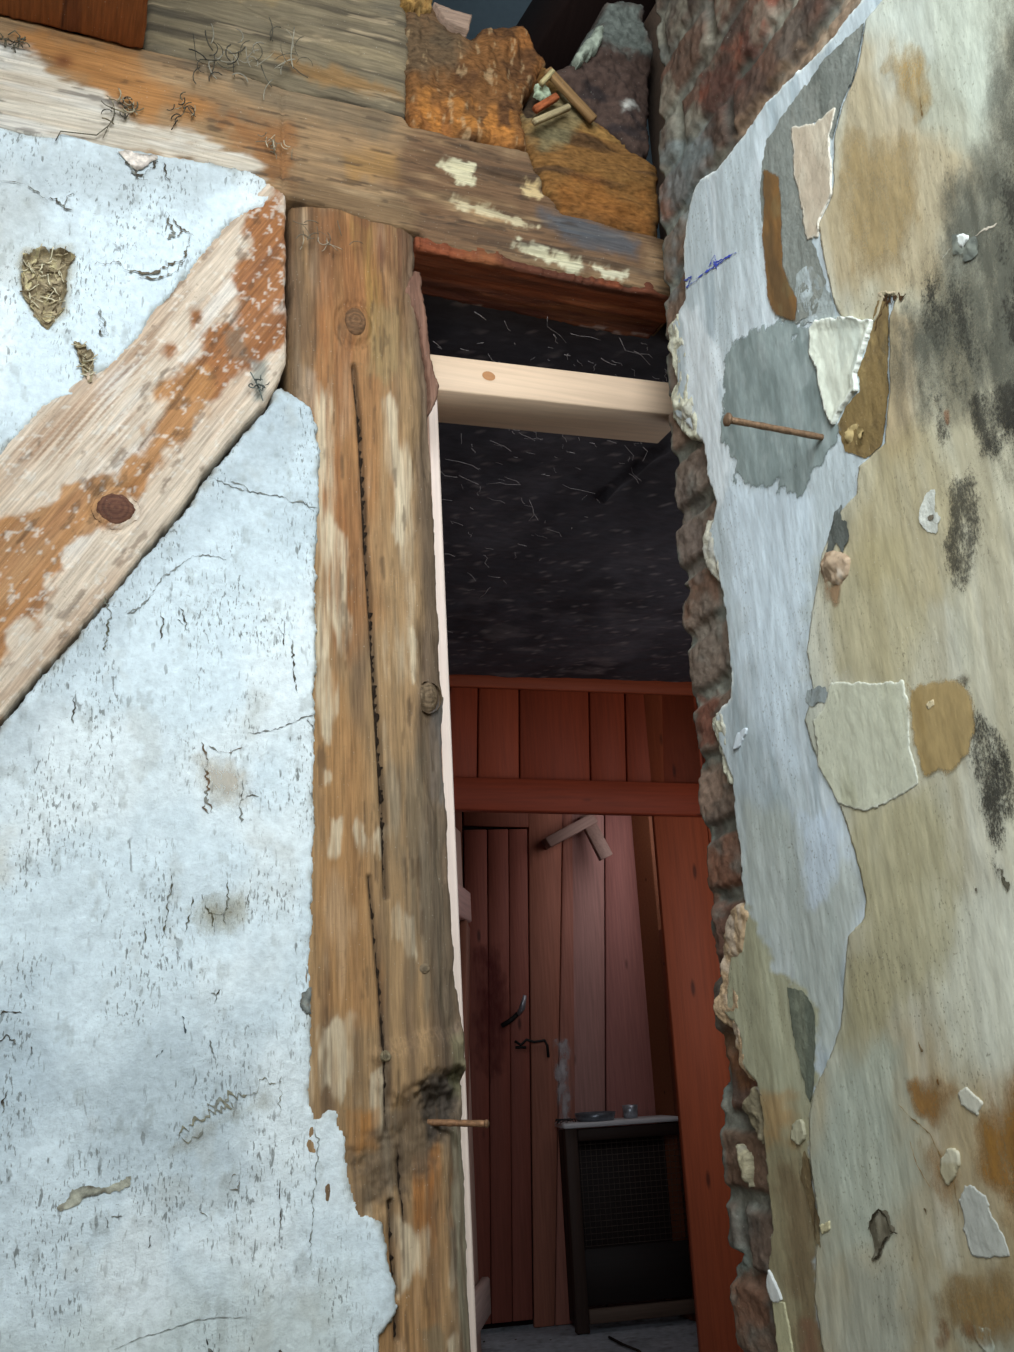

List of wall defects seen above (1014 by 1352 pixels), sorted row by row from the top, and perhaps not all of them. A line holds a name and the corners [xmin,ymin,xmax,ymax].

flaking render [668,313,703,442]
peeling [760,23,889,458]
damp [893,21,1014,455]
damp [943,476,981,592]
crack [352,370,403,1277]
damp [908,679,1014,878]
flaking render [713,902,765,1187]
peeling [787,987,815,1102]